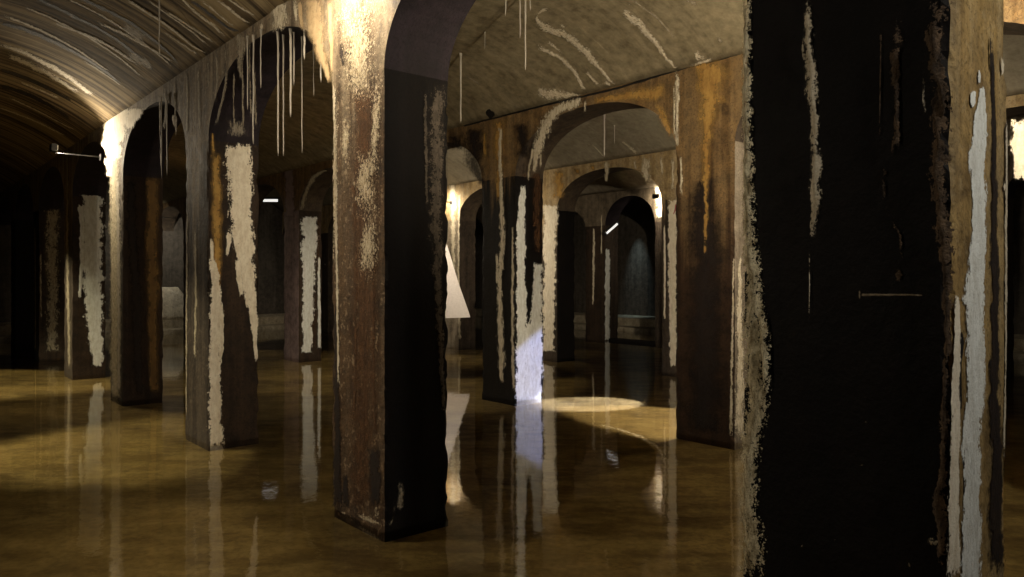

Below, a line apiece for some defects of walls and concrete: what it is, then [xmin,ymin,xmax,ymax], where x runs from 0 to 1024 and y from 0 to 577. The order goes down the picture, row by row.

peeling [78,195,106,367]
damp [0,0,259,172]
rust [211,133,222,286]
peeling [222,144,259,361]
peeling [300,216,321,353]
rust [346,86,381,509]
rust [524,166,594,252]
damp [535,8,614,102]
rust [596,85,671,135]
rust [696,63,723,253]
peeling [758,310,772,394]
peeling [946,70,988,577]